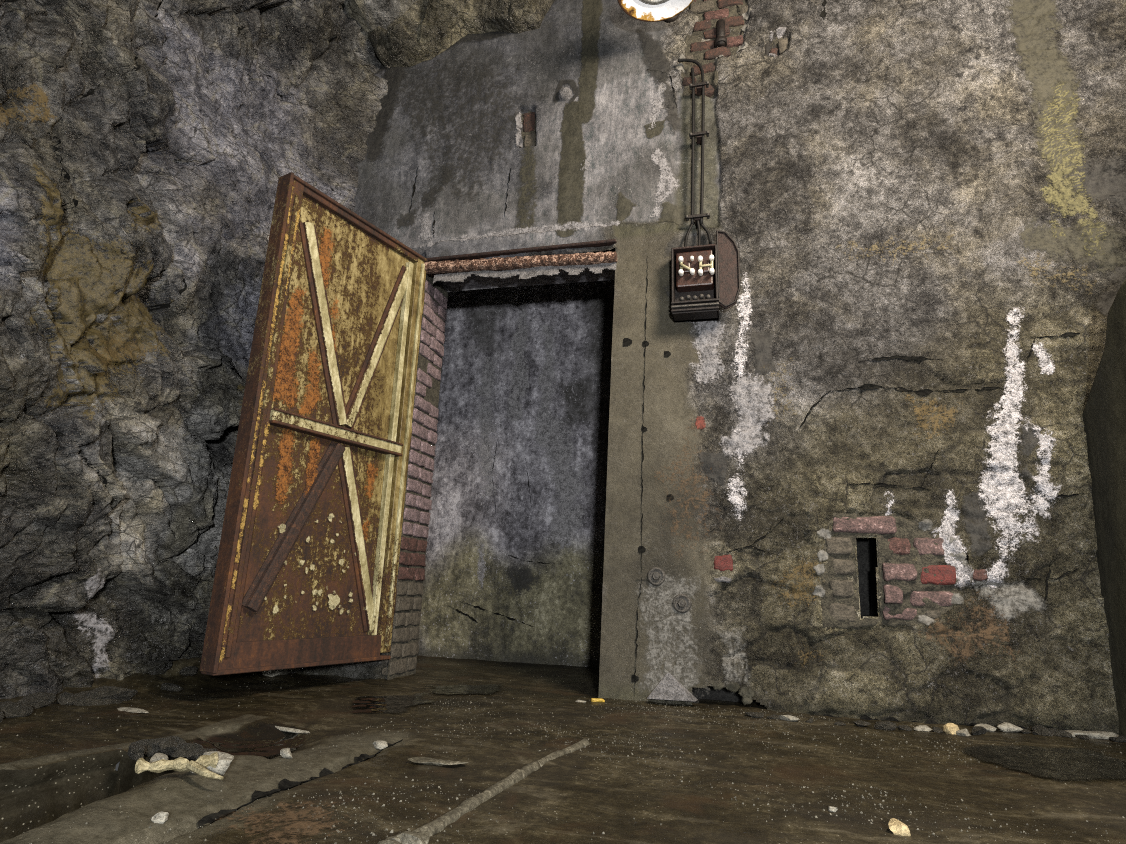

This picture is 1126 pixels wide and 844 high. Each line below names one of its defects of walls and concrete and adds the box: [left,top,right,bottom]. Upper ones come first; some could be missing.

spalling [676,0,752,99]
spalling [765,27,789,57]
rust [319,228,334,288]
rust [272,286,322,416]
water stain [691,272,794,519]
rust [276,429,295,504]
rust [305,438,320,495]
water stain [932,308,1061,588]
spalling [813,513,988,630]